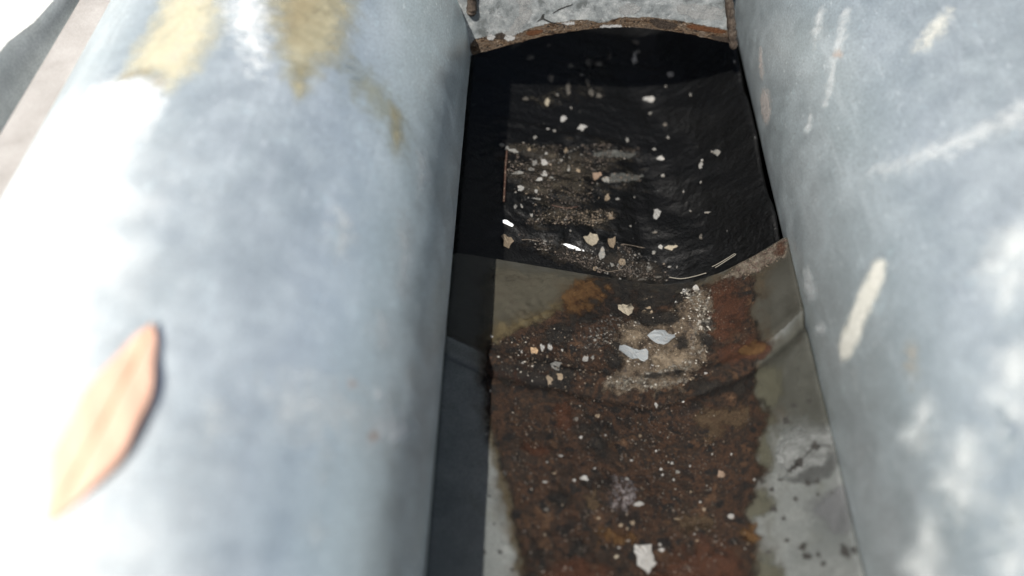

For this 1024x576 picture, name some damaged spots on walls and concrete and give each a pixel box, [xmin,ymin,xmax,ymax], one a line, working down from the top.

rust [470,17,738,55]
rust [481,274,771,576]